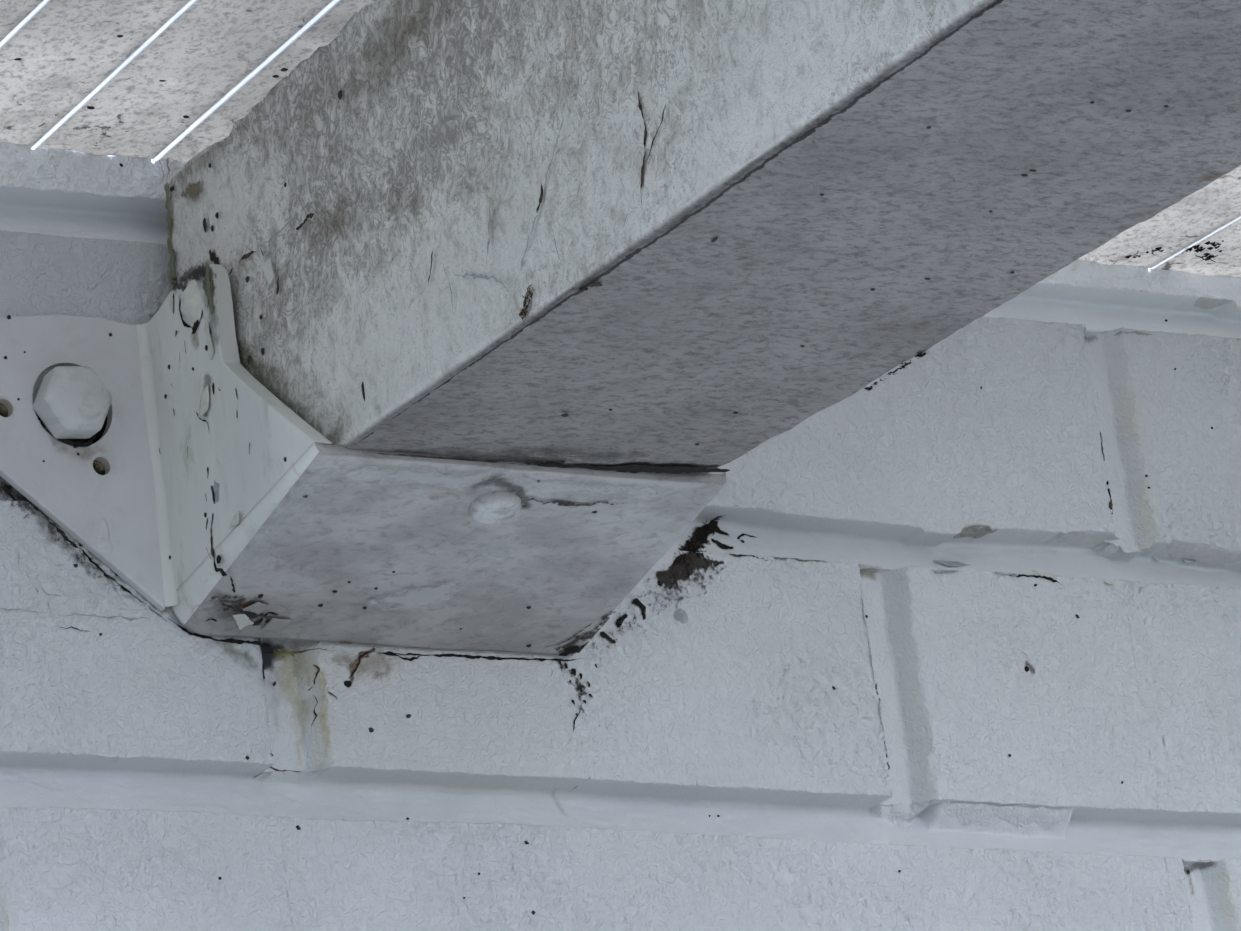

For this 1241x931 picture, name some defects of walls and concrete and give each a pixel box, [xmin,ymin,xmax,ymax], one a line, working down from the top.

crack [623,89,666,228]
peeling [222,594,291,634]
damp [377,505,824,731]